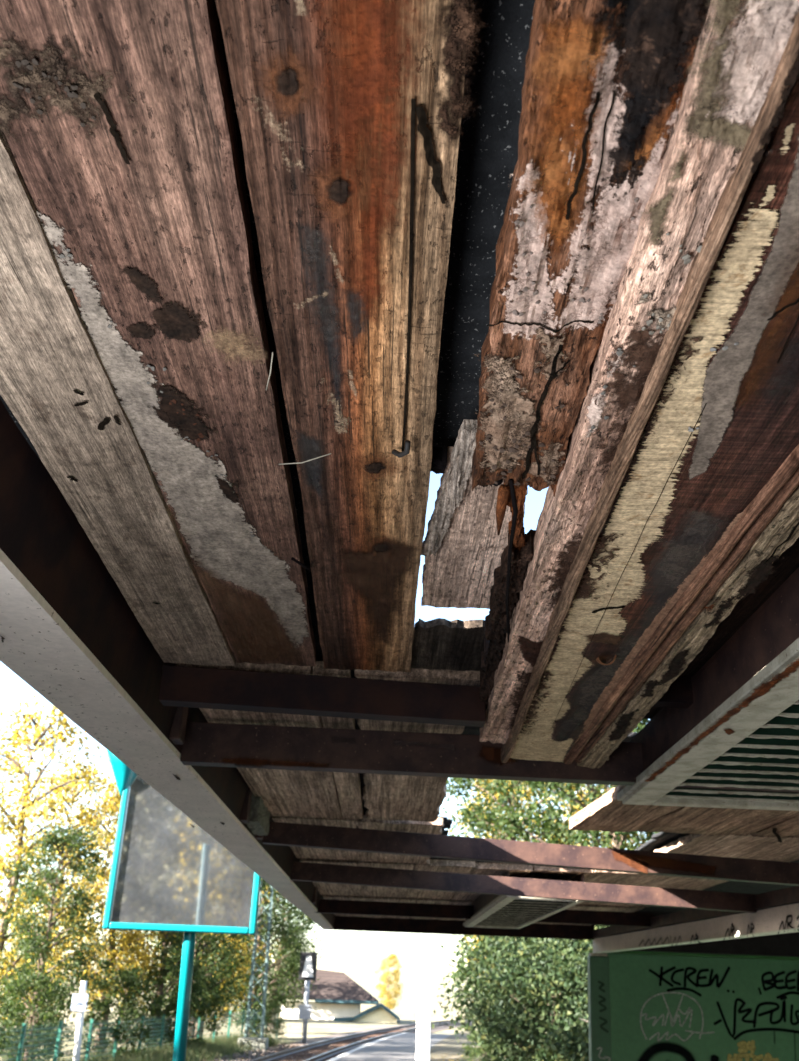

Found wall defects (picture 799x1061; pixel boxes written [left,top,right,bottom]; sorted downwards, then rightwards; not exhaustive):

damp [534,20,605,246]
crack [566,91,616,220]
damp [641,155,687,246]
damp [635,0,751,171]
crack [487,320,594,479]
crack [591,323,703,474]
crack [767,298,799,363]
crack [502,403,707,734]
corrosion [645,659,799,782]